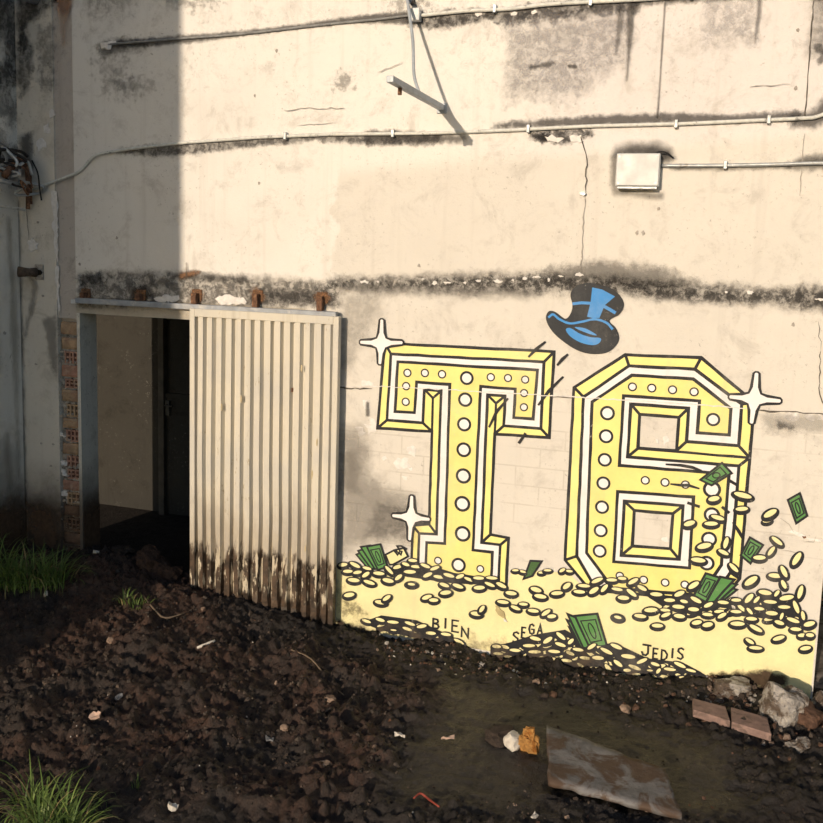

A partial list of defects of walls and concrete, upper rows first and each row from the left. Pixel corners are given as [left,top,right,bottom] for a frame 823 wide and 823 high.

damp [0,0,49,94]
damp [111,32,236,47]
damp [251,0,696,54]
damp [497,104,800,143]
mould [78,272,823,309]
crack [340,322,823,415]
peeling [355,399,376,437]